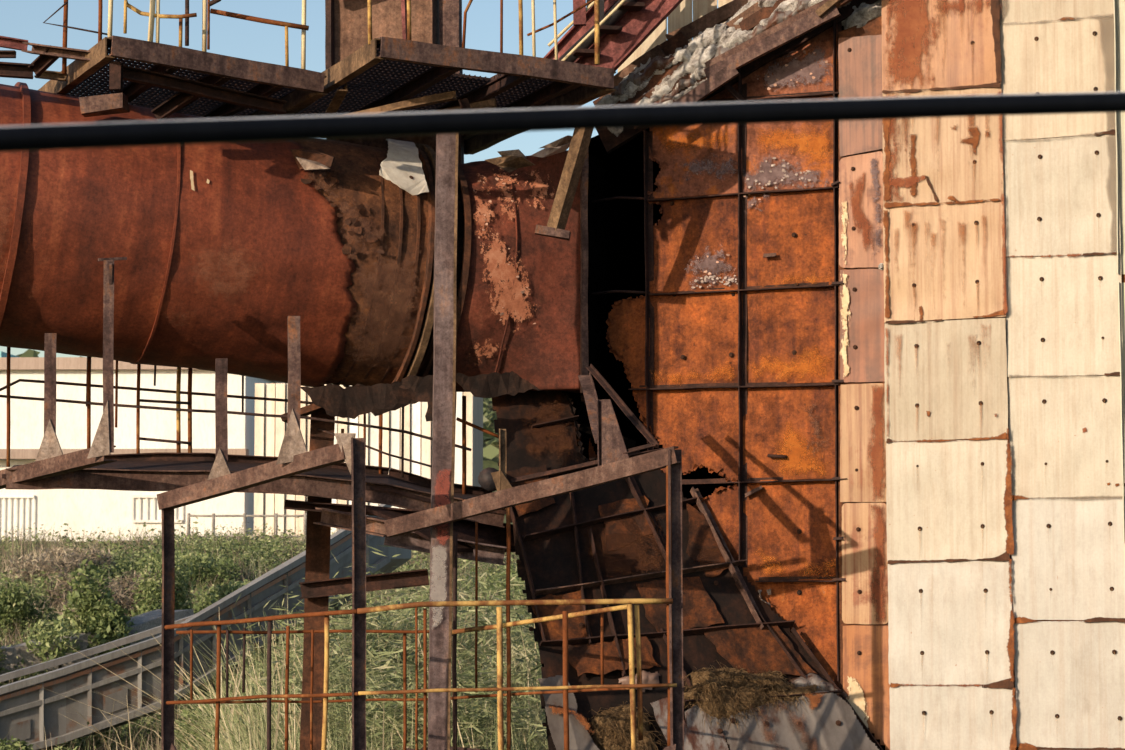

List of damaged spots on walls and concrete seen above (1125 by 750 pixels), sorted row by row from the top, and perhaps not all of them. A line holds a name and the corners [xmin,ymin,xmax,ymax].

corrosion [882,0,1002,97]
corrosion [664,132,728,150]
corrosion [758,128,830,165]
peeling [473,167,555,332]
peeling [474,339,505,361]
corrosion [751,348,825,380]
corrosion [779,432,824,475]
corrosion [840,115,1125,750]
peeling [684,464,738,502]
corrosion [750,693,824,750]